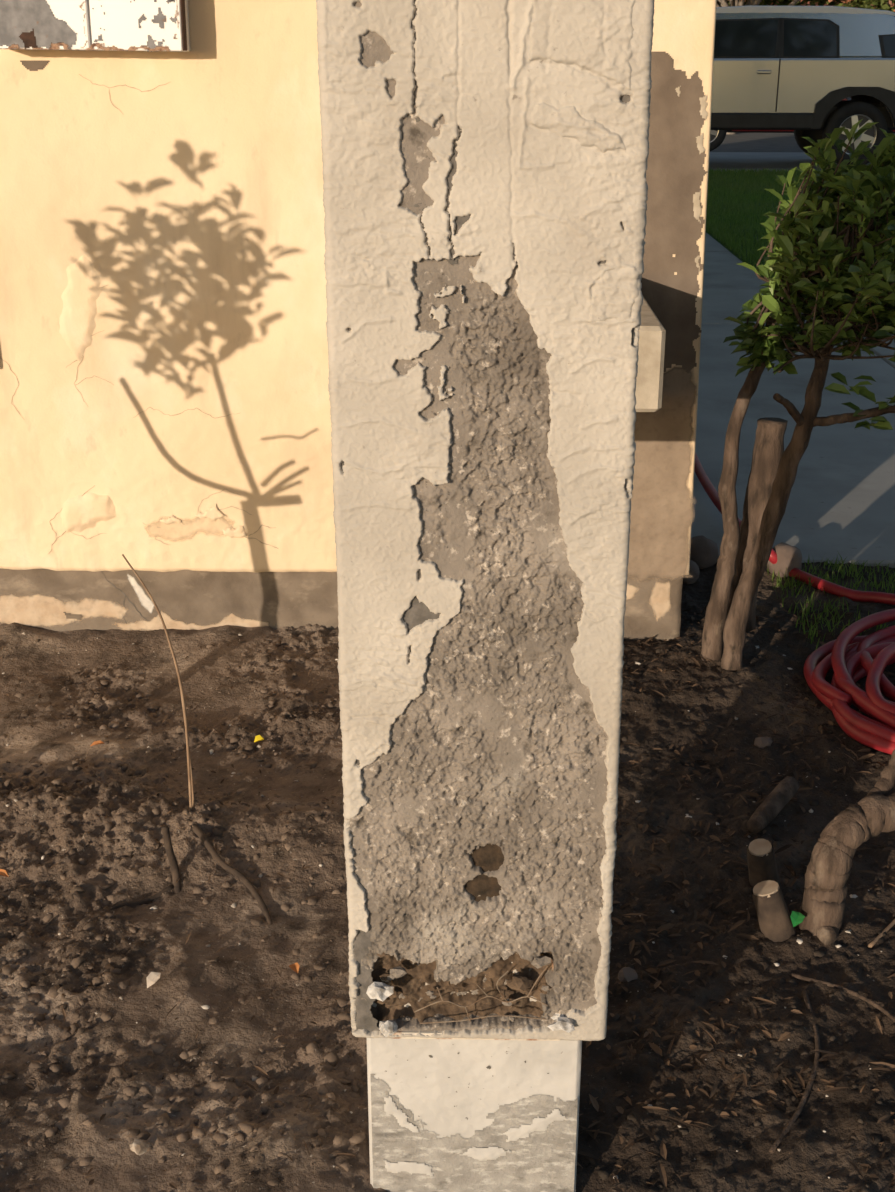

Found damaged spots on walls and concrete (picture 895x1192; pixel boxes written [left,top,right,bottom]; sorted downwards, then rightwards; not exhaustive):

peeling [360,31,394,68]
peeling [386,80,396,98]
crack [407,0,420,122]
peeling [399,105,447,220]
crack [414,127,471,265]
peeling [641,52,708,373]
crack [143,489,278,549]
peeling [0,575,269,630]
spalling [350,254,608,1032]